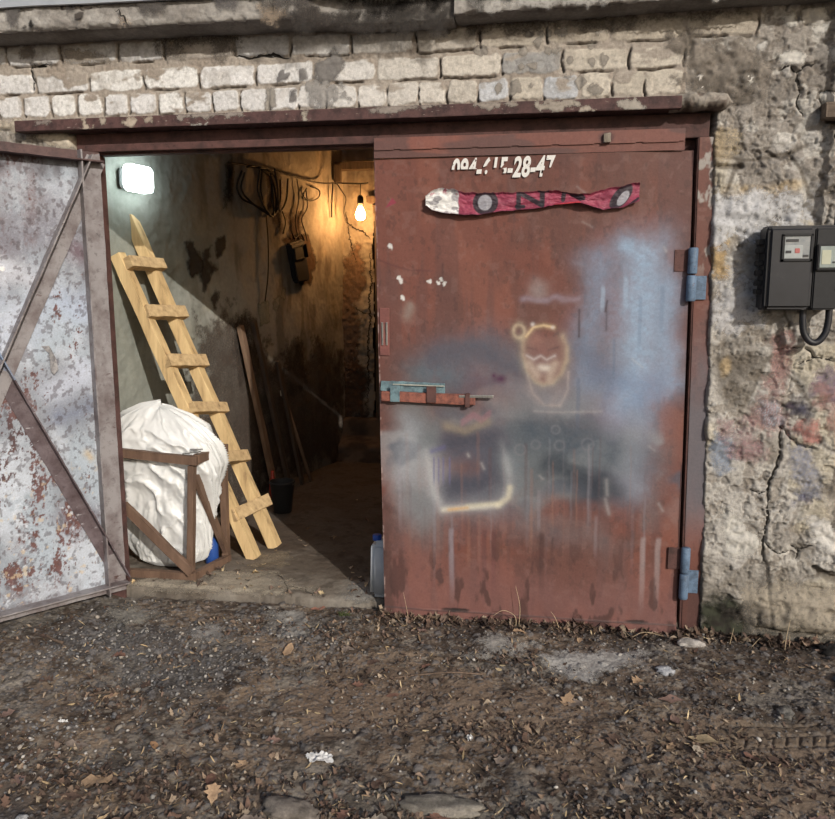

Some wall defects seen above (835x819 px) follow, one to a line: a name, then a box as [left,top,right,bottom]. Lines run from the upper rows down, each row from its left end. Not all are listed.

crack [31,63,51,90]
crack [781,63,835,116]
peeling [122,116,153,127]
peeling [370,104,436,114]
peeling [473,102,518,111]
peeling [535,99,595,112]
peeling [617,97,646,110]
leakage [184,236,346,493]
leakage [228,464,244,504]
crack [750,405,817,588]